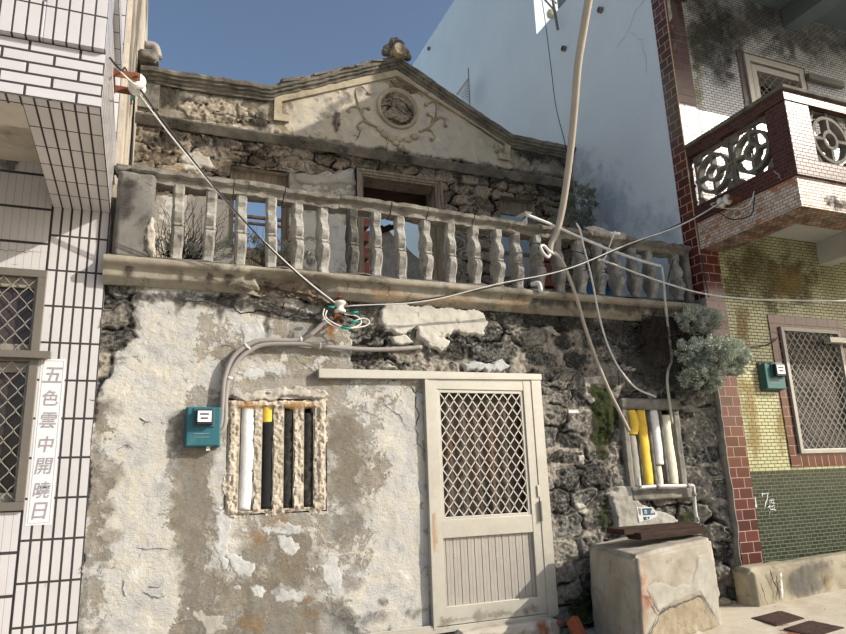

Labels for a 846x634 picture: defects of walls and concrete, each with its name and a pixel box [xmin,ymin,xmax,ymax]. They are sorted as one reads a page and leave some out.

damp [130,0,148,72]
damp [691,19,740,82]
damp [141,127,183,155]
peeling [229,319,269,345]
flaking render [378,302,488,353]
peeling [236,366,285,379]
spalling [231,386,329,403]
crack [382,385,425,451]
peeling [212,507,306,604]
peeling [311,552,342,597]
peeling [186,607,227,634]
spalling [651,597,717,634]